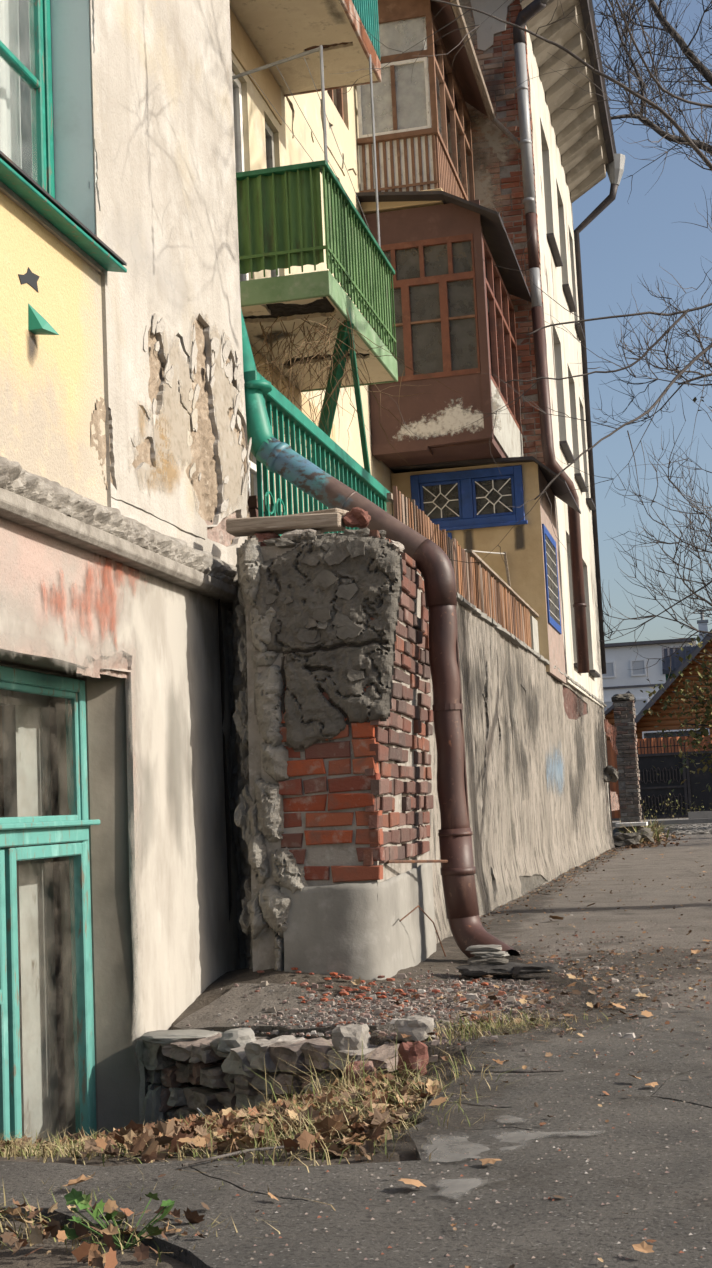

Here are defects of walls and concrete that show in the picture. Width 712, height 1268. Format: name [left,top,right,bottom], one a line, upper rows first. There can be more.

spalling [90,397,113,489]
peeling [132,313,252,546]
peeling [301,538,366,600]
corrosion [465,530,473,550]
corrosion [516,525,524,550]
peeling [306,608,364,640]